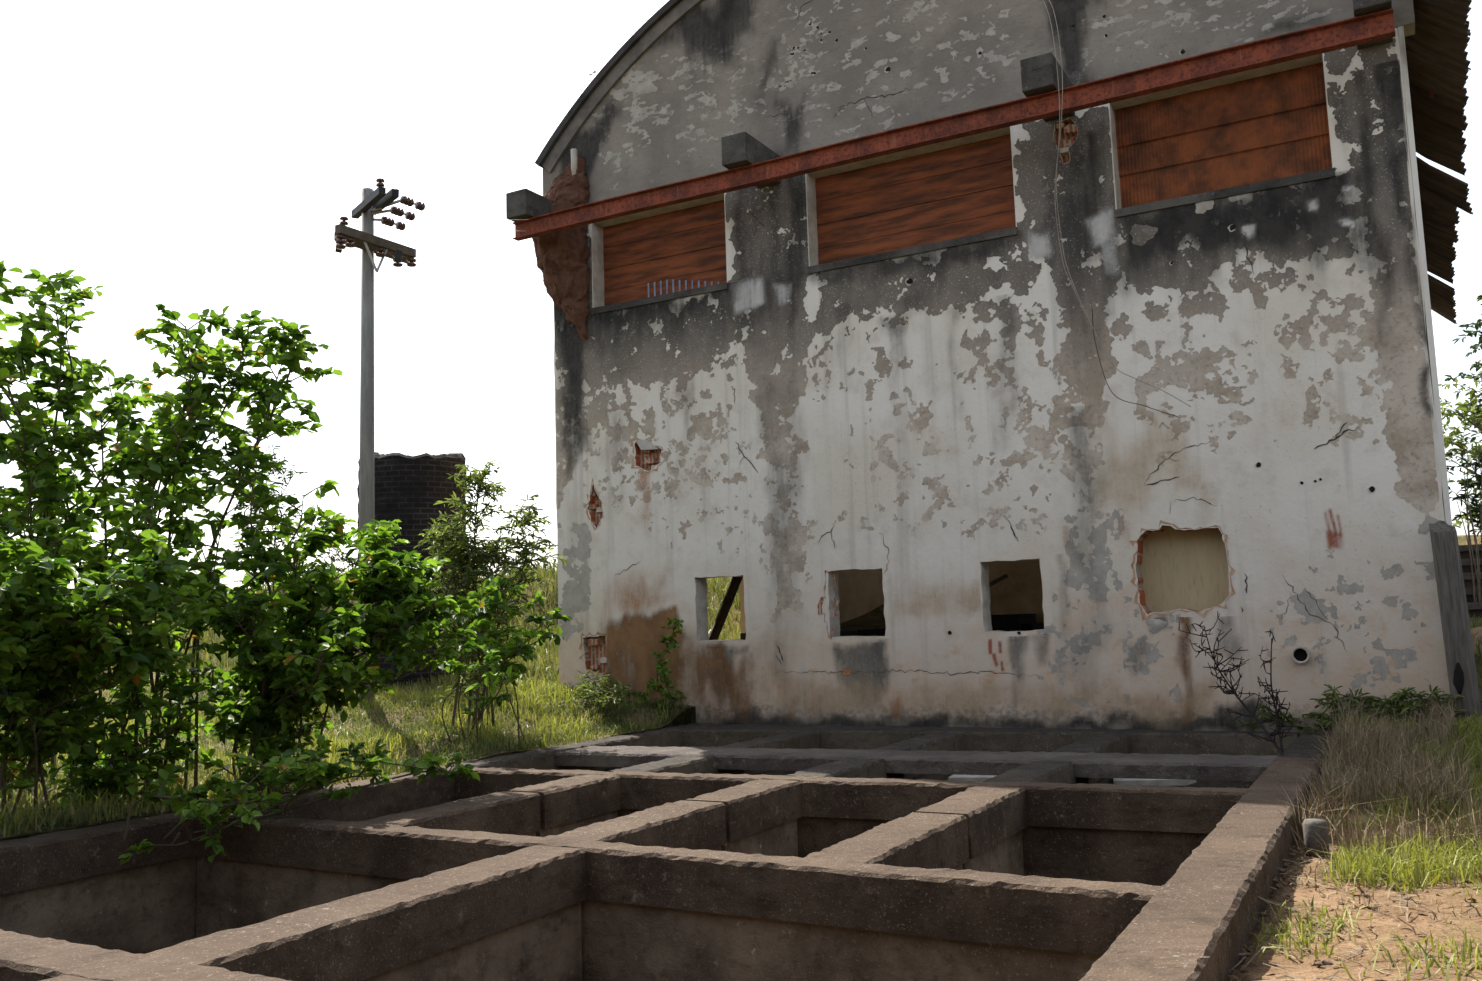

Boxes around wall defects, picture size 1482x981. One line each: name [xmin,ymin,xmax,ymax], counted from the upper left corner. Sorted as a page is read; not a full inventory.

peeling [592,0,1021,190]
water stain [1376,59,1408,162]
peeling [555,38,1447,707]
crack [1147,442,1215,507]
crack [1314,422,1357,450]